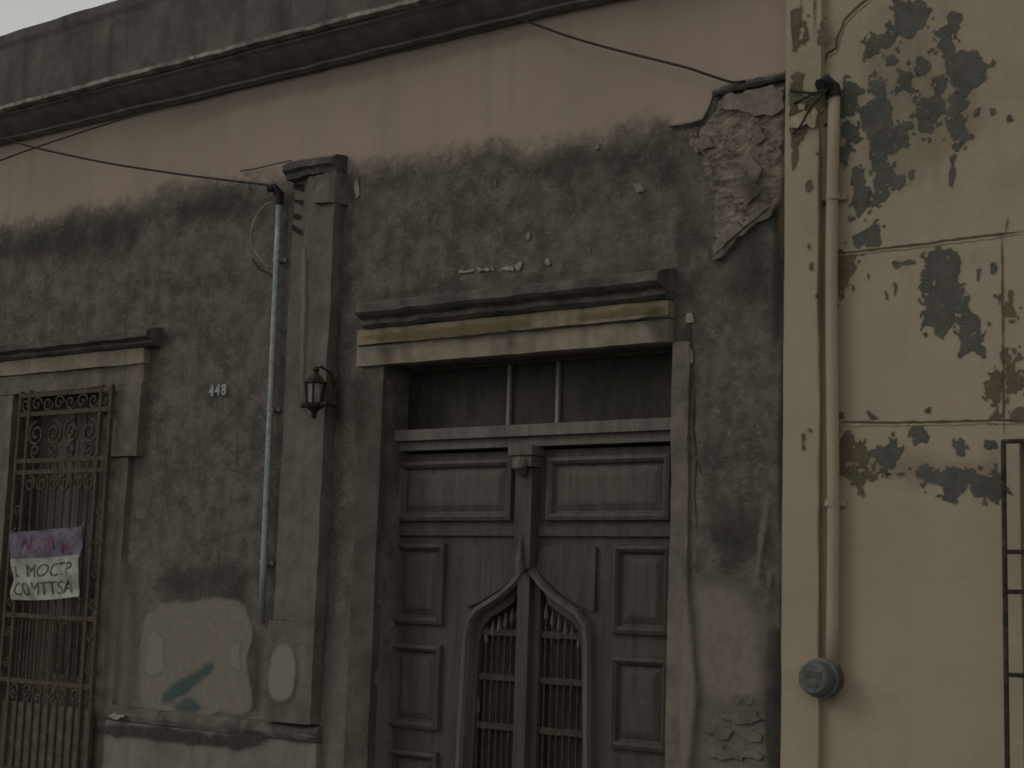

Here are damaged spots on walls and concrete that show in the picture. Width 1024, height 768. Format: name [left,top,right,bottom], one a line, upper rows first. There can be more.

crack [825,0,870,66]
spalling [688,0,1013,307]
leakage [0,327,163,362]
spalling [459,262,523,274]
leakage [354,268,676,339]
leakage [773,139,785,555]
peeling [892,246,1024,425]
peeling [839,412,1013,505]